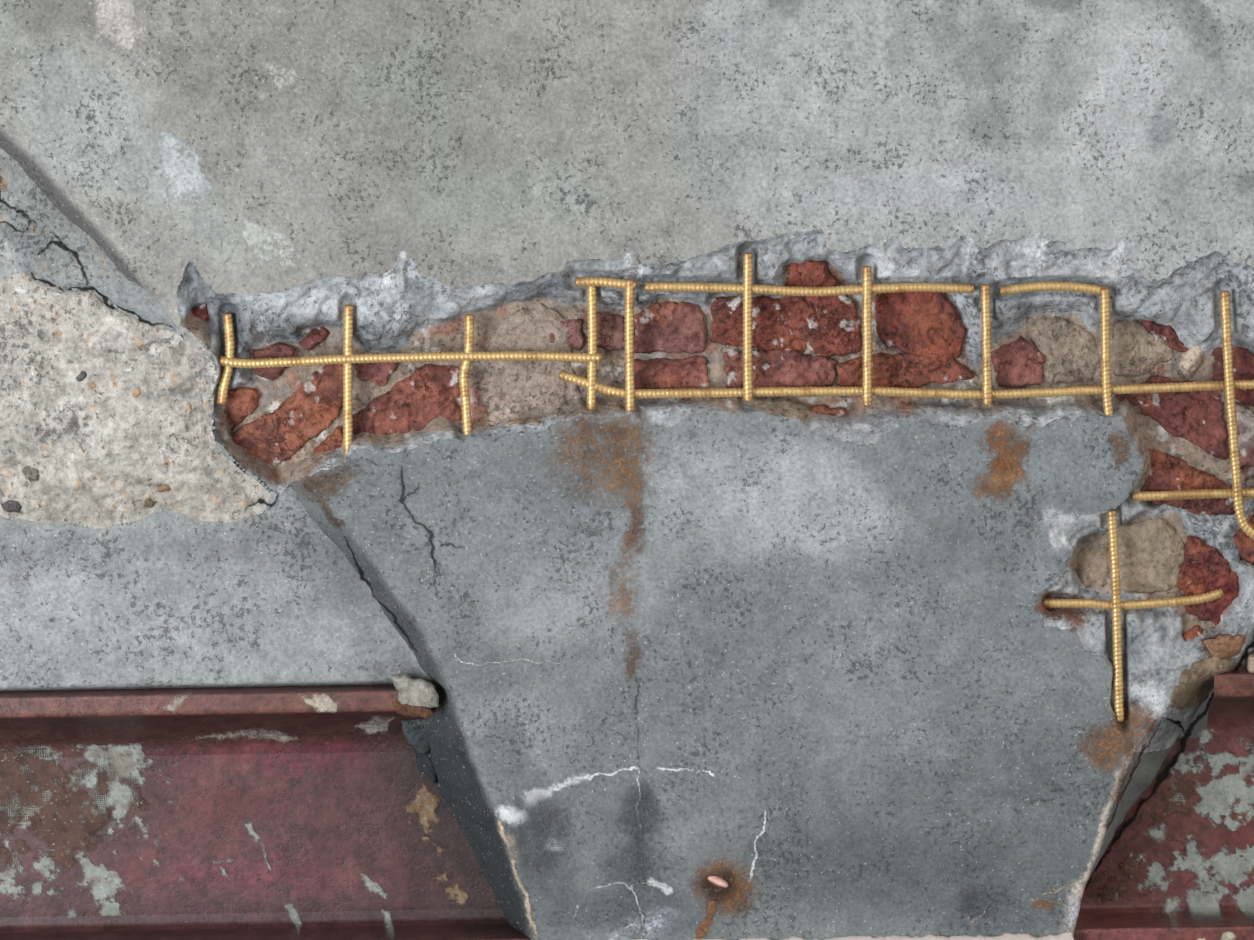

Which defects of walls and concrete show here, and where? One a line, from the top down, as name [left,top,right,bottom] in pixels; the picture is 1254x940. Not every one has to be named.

crack [0,177,173,328]
peeling [240,214,300,269]
crack [344,537,417,652]
crack [399,466,462,594]
corrosion [555,417,651,616]
spalling [177,230,1254,939]
corrosion [973,420,1030,499]
peeling [0,744,159,900]
peeling [68,842,125,916]
corrosion [694,858,754,940]
crack [750,811,766,880]
crack [1030,691,1214,907]